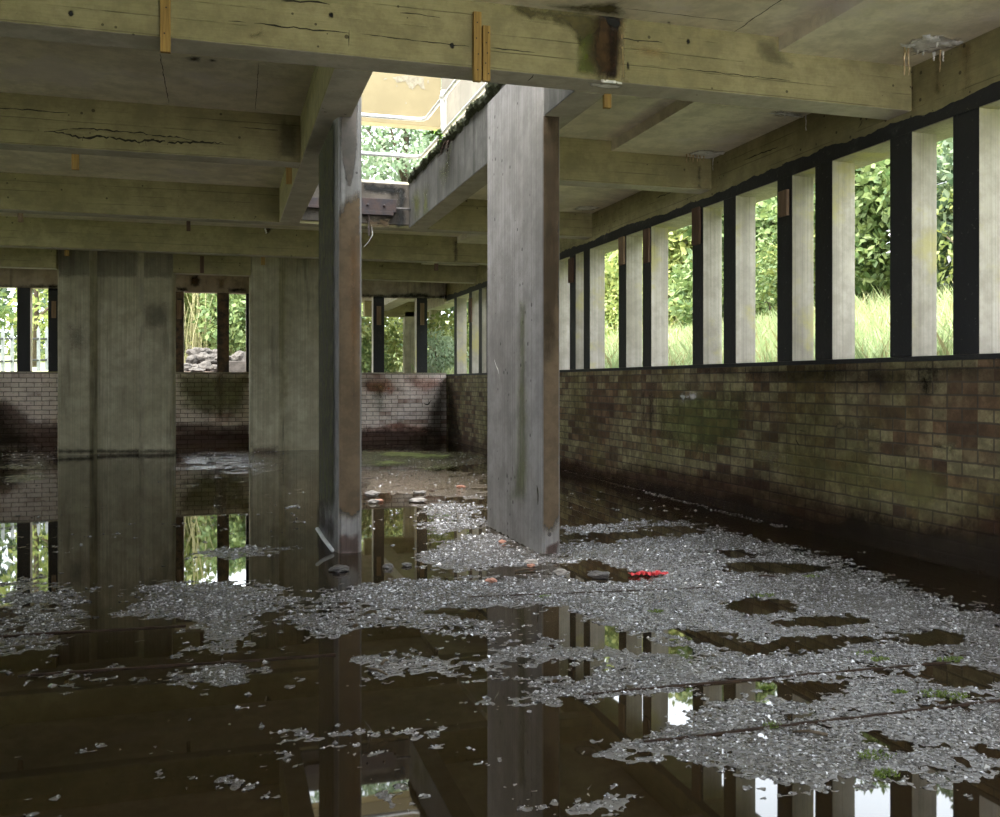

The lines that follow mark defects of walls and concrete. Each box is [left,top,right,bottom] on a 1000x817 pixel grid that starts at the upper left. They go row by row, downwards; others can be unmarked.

damp [514,3,624,88]
rust [590,16,624,78]
efflorescence [900,34,964,75]
crack [0,108,222,145]
damp [361,385,459,442]
damp [559,457,1000,579]